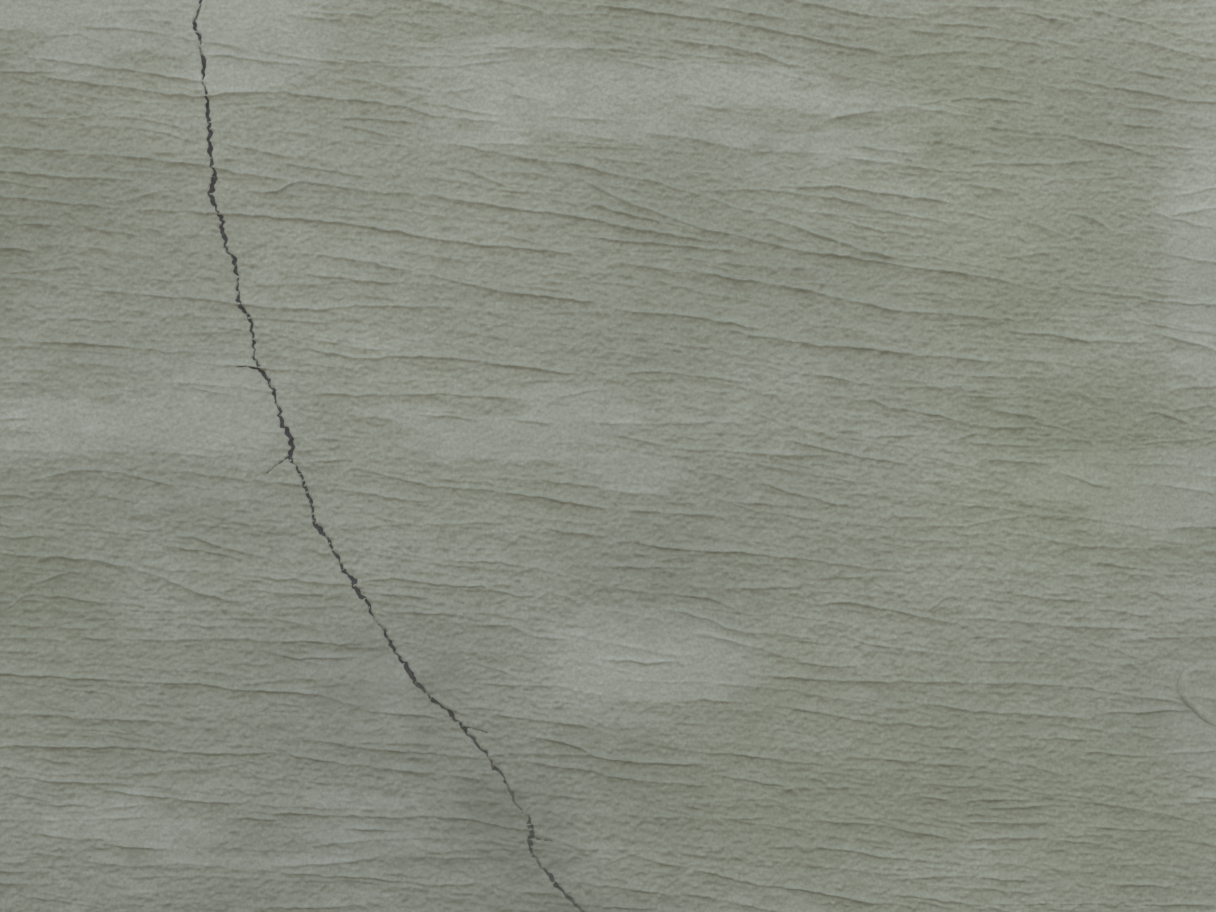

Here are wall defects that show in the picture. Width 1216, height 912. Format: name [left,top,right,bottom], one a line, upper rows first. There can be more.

crack [192,0,585,912]